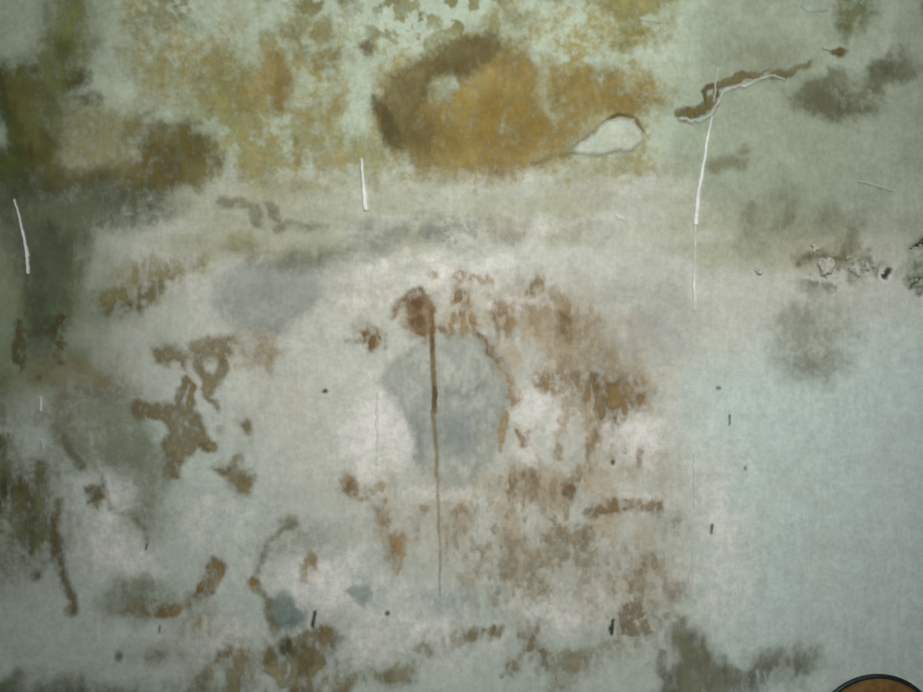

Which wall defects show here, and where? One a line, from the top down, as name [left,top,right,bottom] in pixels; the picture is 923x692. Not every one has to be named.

water stain [360,29,397,53]
water stain [373,0,648,175]
crack [676,60,811,123]
water stain [796,60,916,119]
flaking render [571,113,644,155]
water stain [0,0,339,487]
rust [394,287,499,423]
peeling [132,337,232,478]
rust [499,373,524,450]
water stain [86,486,104,505]
rust [342,476,368,500]
water stain [0,461,77,614]